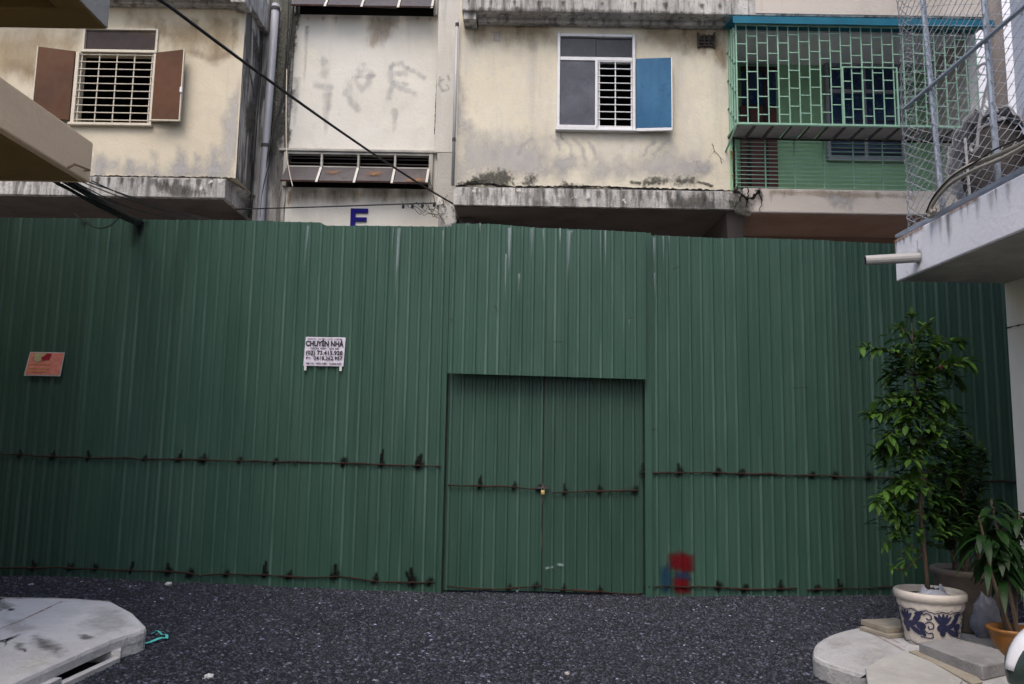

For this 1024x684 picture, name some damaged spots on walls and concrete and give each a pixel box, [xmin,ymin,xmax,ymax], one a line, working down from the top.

leakage [96,25,262,197]
leakage [458,141,607,204]
leakage [595,153,714,208]